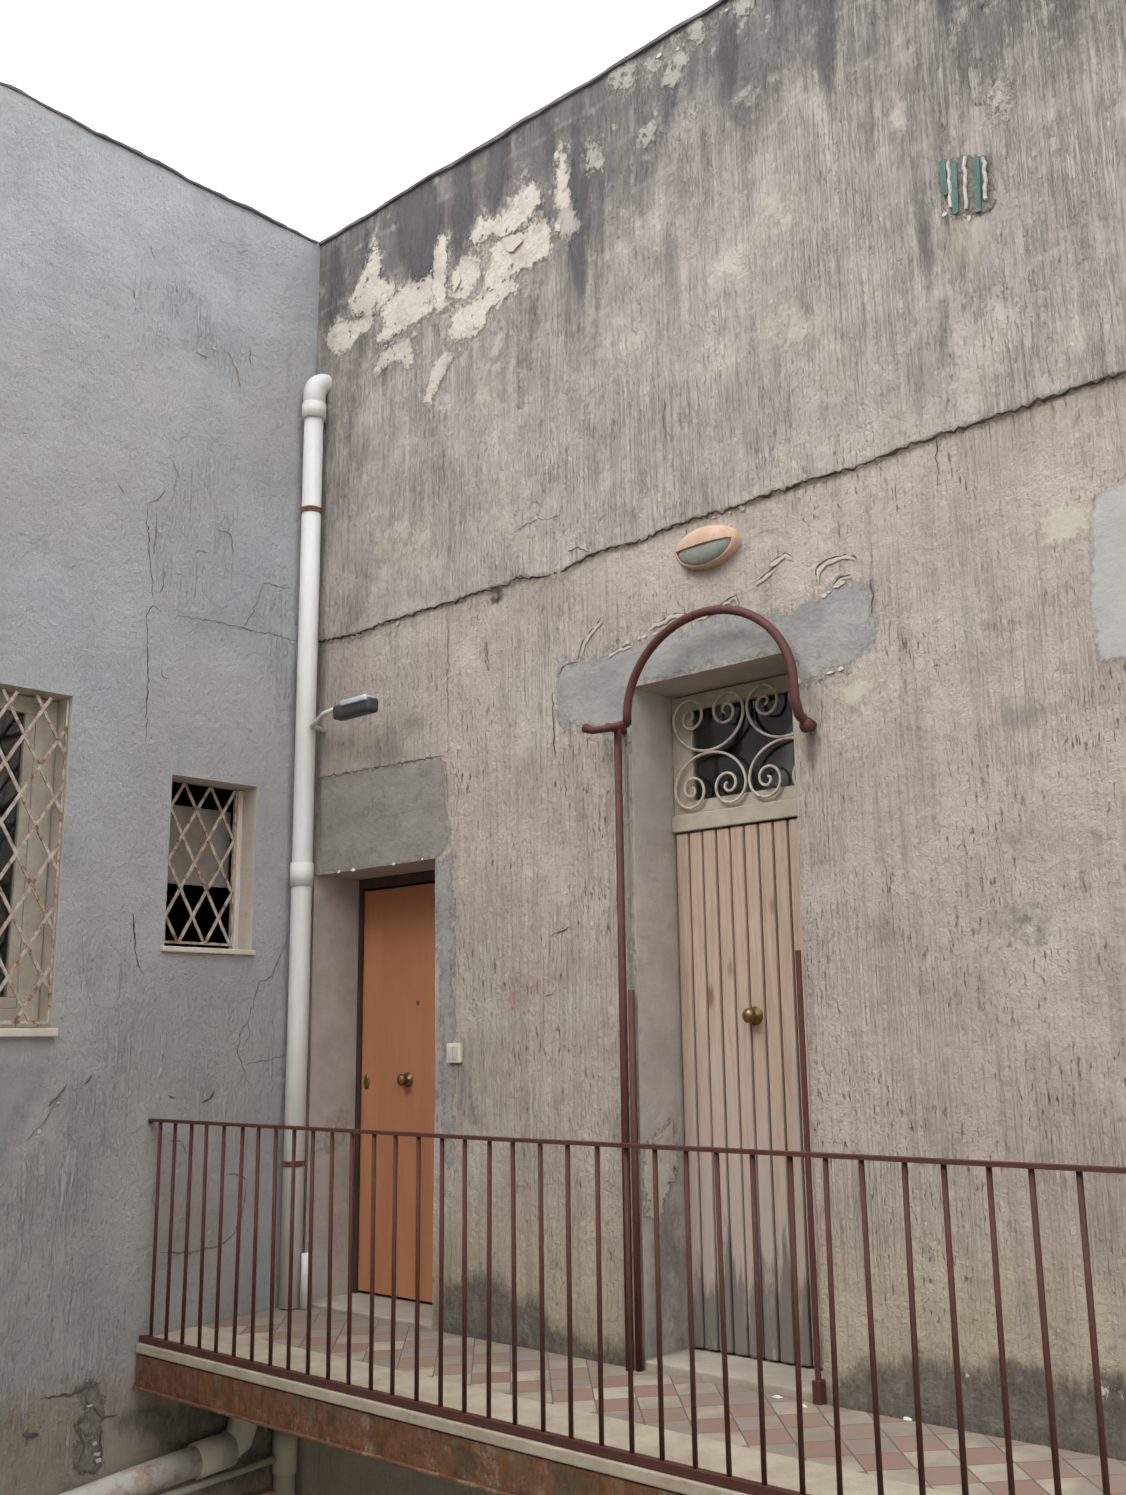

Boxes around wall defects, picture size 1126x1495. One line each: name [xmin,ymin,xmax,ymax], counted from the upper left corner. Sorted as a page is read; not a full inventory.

flaking render [606,0,760,154]
water stain [816,0,833,89]
water stain [544,117,554,164]
water stain [571,125,587,292]
flaking render [320,126,606,417]
flaking render [370,511,433,564]
crack [118,371,1126,810]
flaking render [41,1379,118,1476]
water stain [121,1405,229,1450]
water stain [205,1425,272,1491]
water stain [831,1357,1126,1461]